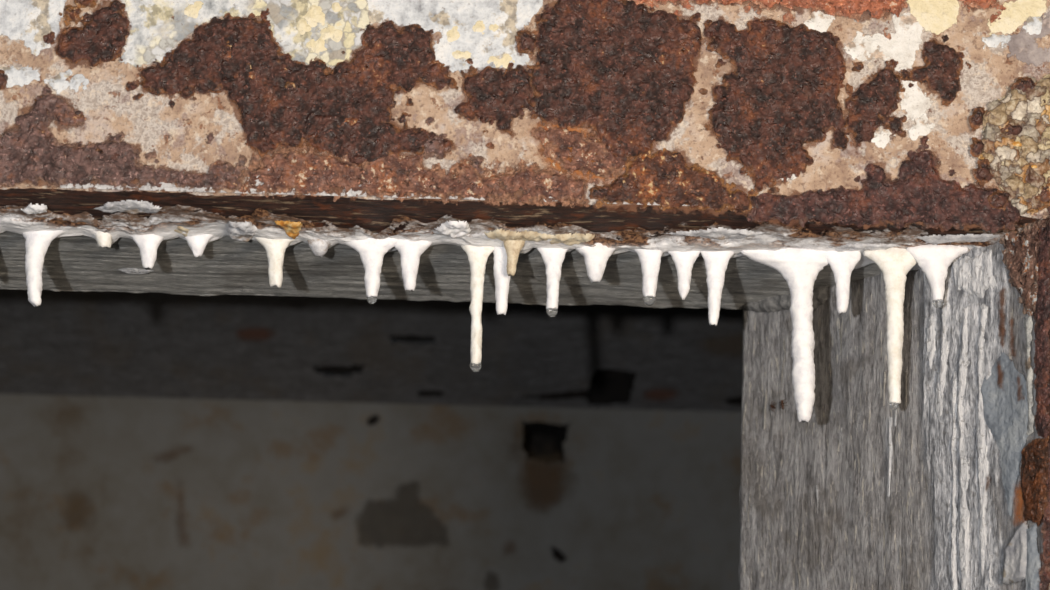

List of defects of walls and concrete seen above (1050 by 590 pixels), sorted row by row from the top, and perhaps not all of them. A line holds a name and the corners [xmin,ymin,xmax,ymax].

rust [0,0,1050,233]
damp [0,169,1026,590]
hole [522,422,570,465]
peeling [981,315,1041,590]
rust [998,216,1050,590]